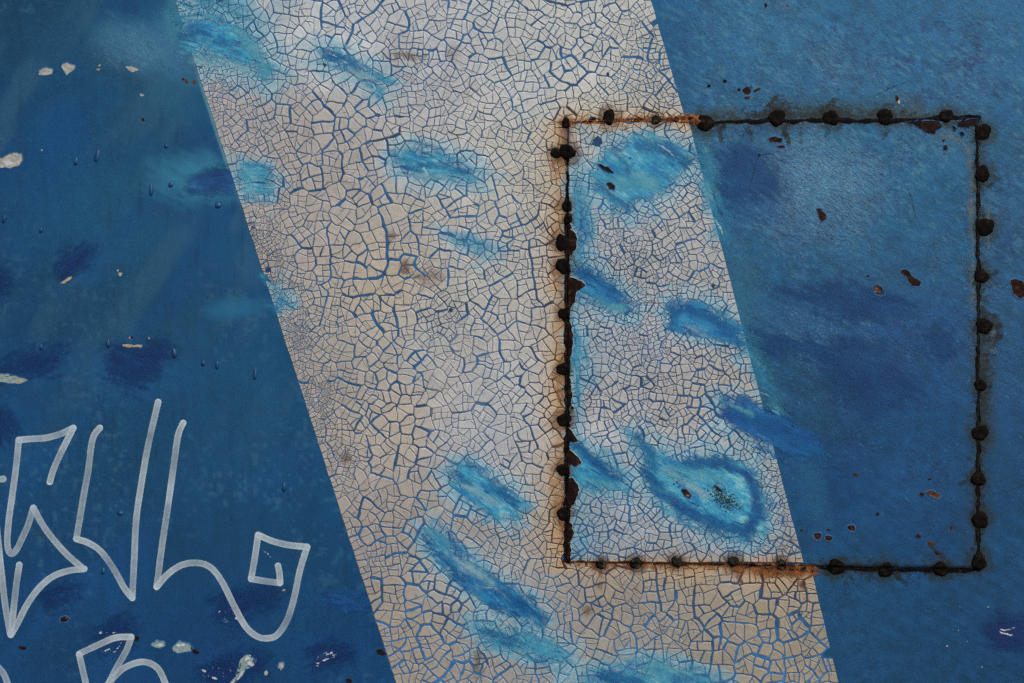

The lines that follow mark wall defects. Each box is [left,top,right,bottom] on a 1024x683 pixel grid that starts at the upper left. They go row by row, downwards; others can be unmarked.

peeling [38,62,76,76]
corrosion [643,113,706,125]
peeling [0,152,24,169]
crack [175,0,839,683]
peeling [0,373,28,385]
corrosion [684,563,817,588]
peeling [95,616,199,654]
peeling [202,653,285,683]